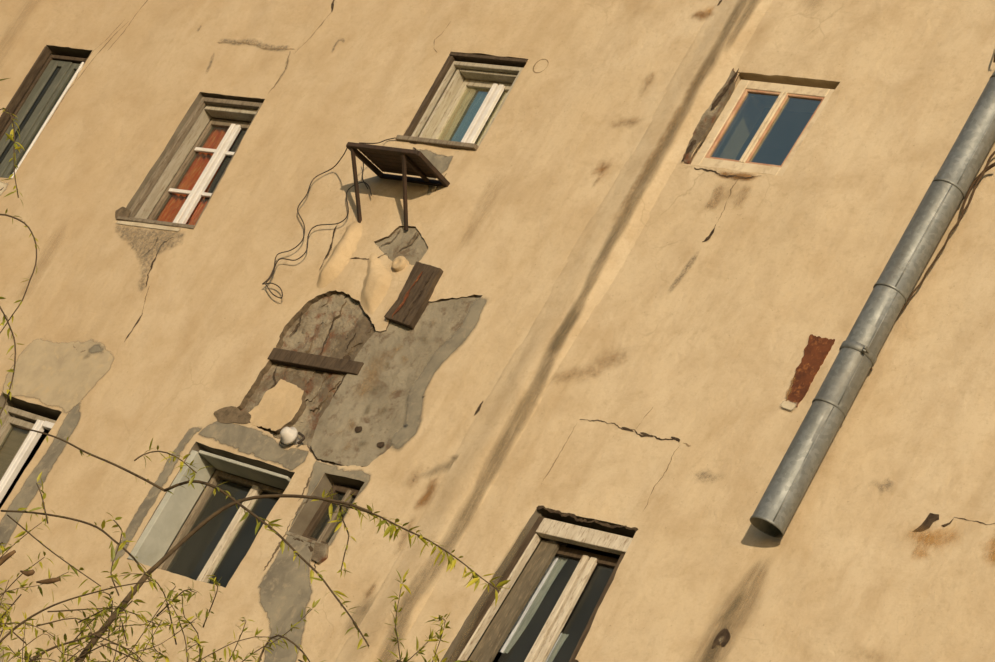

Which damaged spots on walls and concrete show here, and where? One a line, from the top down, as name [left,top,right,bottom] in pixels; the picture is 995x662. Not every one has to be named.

crack [198,0,336,91]
flaking render [681,68,739,164]
flaking render [374,226,428,265]
crack [672,180,738,288]
peeling [214,290,487,467]
crack [536,407,691,531]